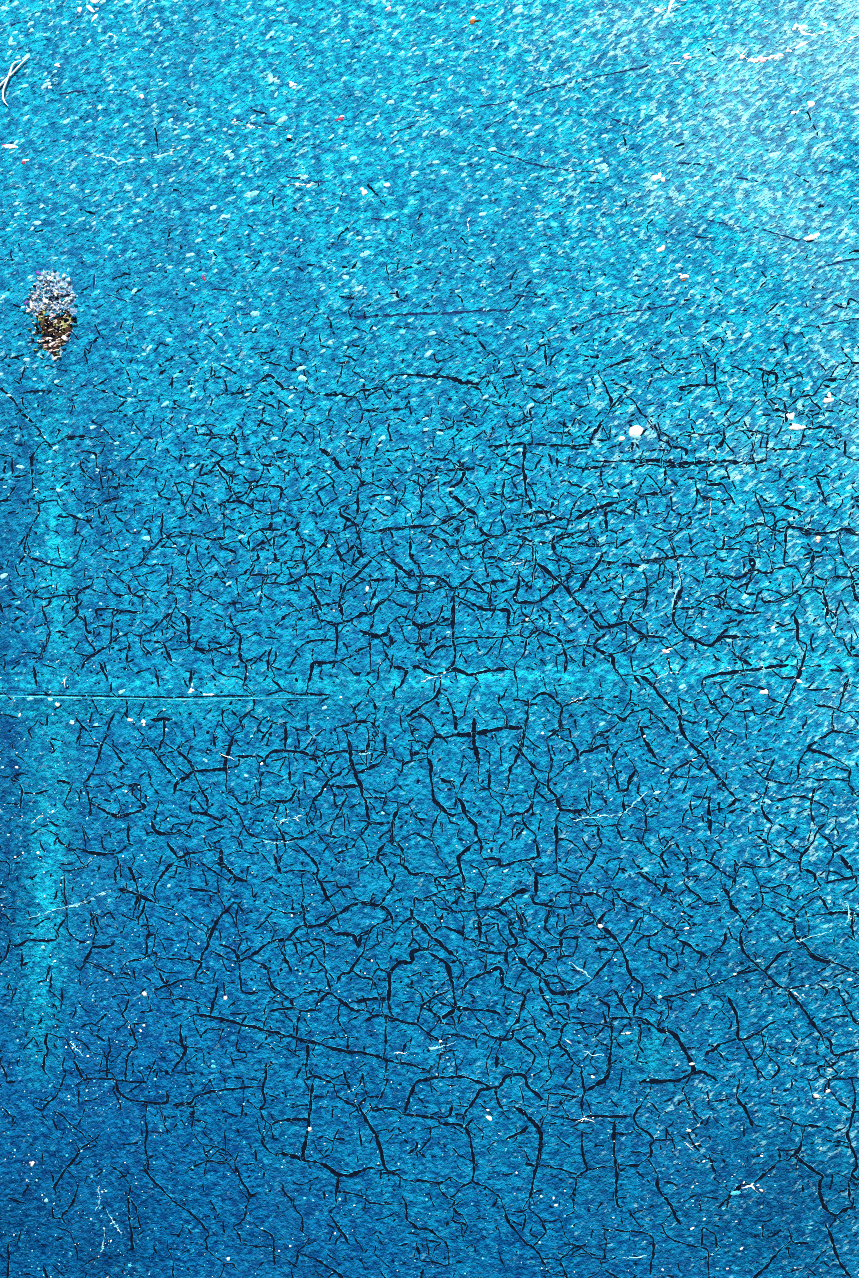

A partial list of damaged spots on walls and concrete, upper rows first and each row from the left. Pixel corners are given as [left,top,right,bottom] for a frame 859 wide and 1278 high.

crack [231,107,283,128]
crack [611,118,634,150]
crack [67,189,100,237]
crack [189,248,282,317]
crack [263,175,343,210]
crack [328,227,364,284]
crack [361,184,442,313]
crack [444,237,496,275]
crack [695,216,815,261]
crack [674,143,852,211]
peeling [22,268,78,361]
crack [0,263,859,1278]